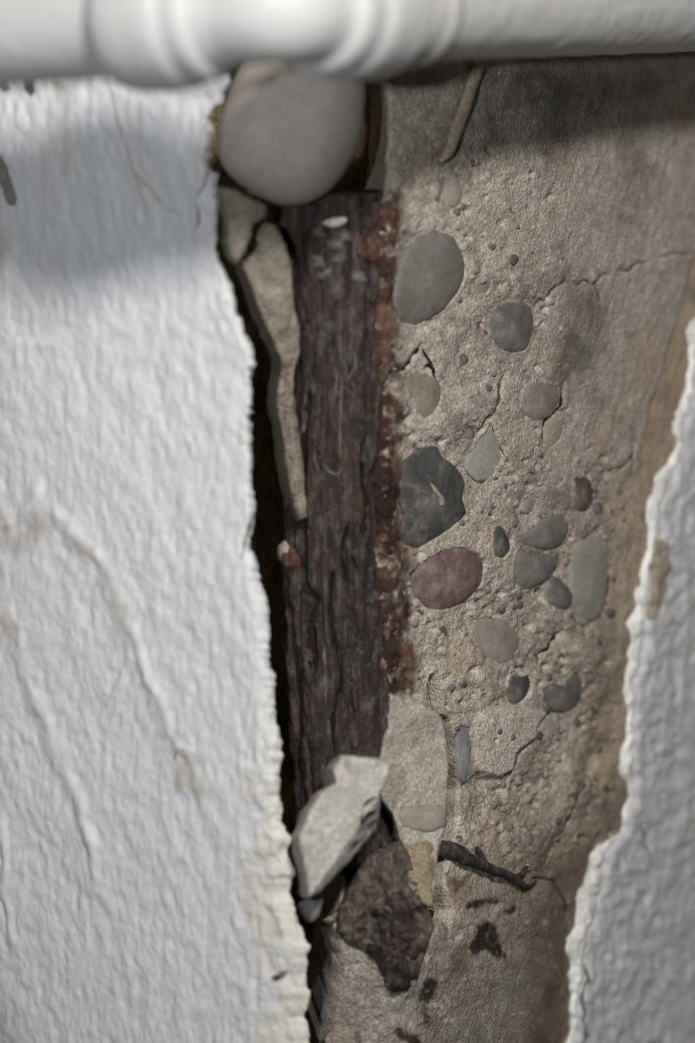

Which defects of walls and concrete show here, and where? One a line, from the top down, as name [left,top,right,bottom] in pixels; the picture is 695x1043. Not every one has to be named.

crack [534,253,686,306]
rust [350,191,416,695]
spalling [190,51,695,1043]
crack [507,718,544,778]
crack [531,877,567,915]